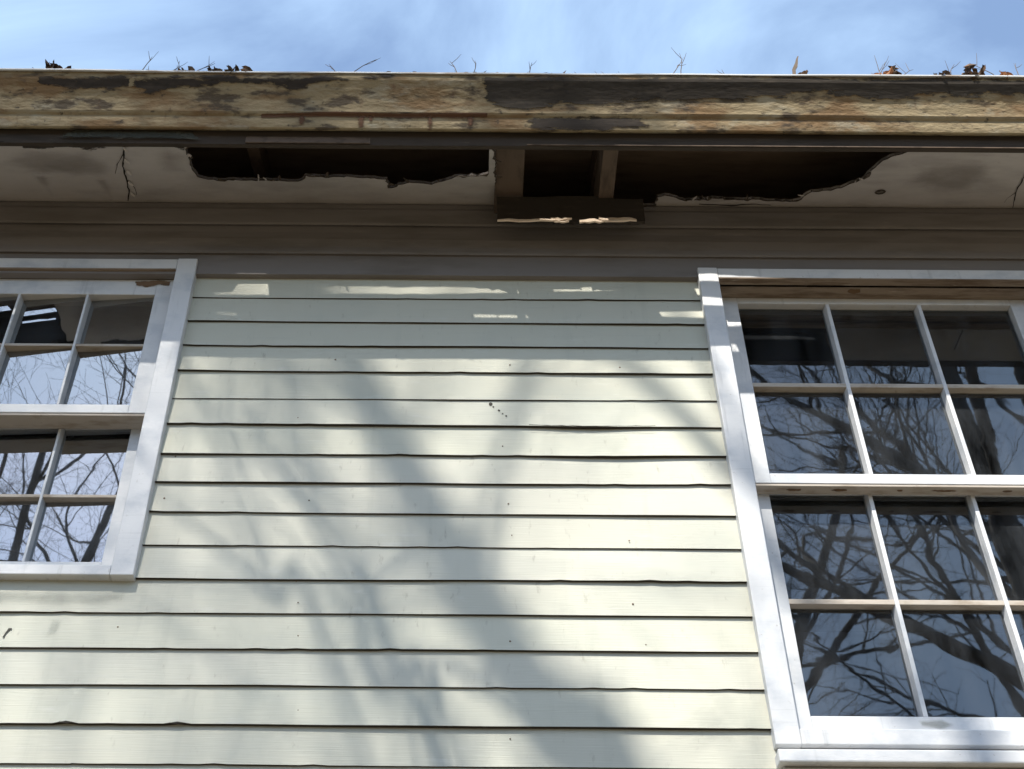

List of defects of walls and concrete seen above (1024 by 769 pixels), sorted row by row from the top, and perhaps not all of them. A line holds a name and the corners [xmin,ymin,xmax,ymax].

water stain [63,130,198,139]
crack [115,147,137,200]